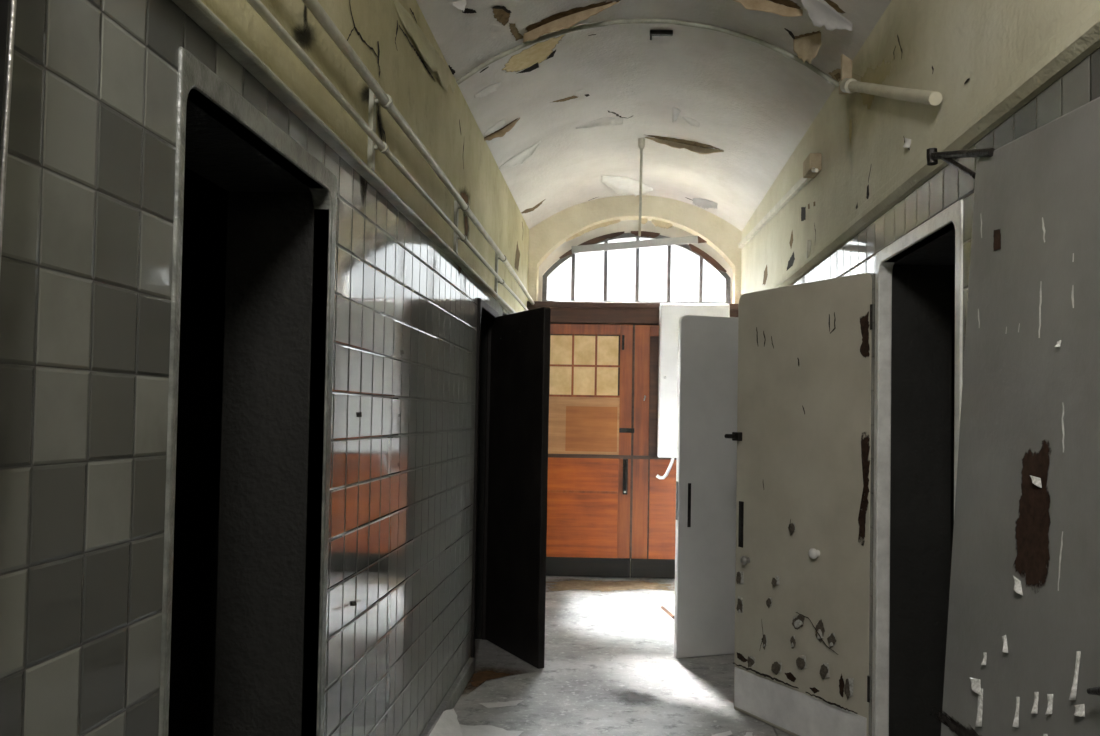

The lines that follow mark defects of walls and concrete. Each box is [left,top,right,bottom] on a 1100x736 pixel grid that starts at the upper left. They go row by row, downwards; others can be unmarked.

crack [347,0,417,76]
peeling [492,0,620,74]
peeling [733,0,853,64]
peeling [553,89,590,102]
peeling [484,118,520,141]
peeling [645,135,724,154]